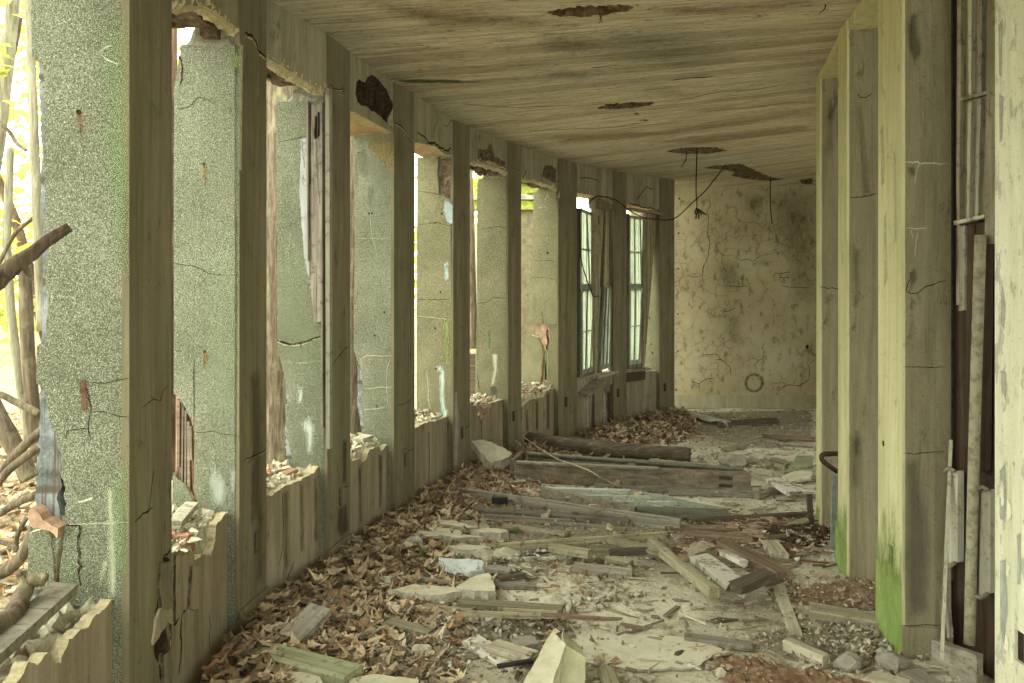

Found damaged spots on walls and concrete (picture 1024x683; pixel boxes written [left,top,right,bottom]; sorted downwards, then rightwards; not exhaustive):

spalling [172,0,240,37]
spalling [544,4,640,19]
spalling [355,75,393,124]
spalling [594,102,655,122]
spalling [470,144,507,176]
spalling [521,165,557,192]
spalling [665,147,784,181]
crack [691,196,838,312]
crack [906,228,945,294]
crack [692,344,810,391]
spalling [176,398,193,491]
crack [66,470,154,588]